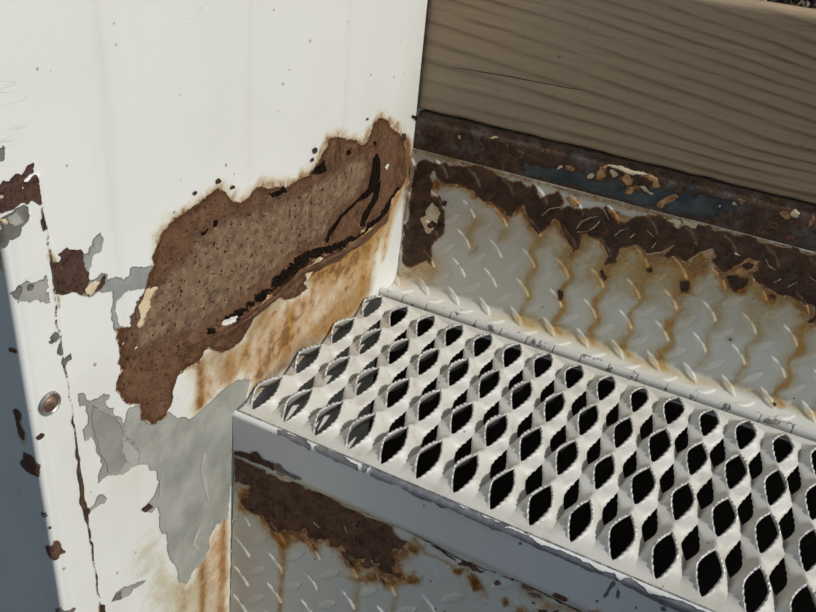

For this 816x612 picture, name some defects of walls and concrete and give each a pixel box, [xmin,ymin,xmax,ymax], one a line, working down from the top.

peeling [0,205,30,248]
peeling [10,275,50,304]
peeling [83,265,153,328]
corrosion [114,114,816,425]
crack [42,207,106,612]
peeling [78,379,301,584]
corrosion [234,457,419,588]
corrosion [453,569,482,592]